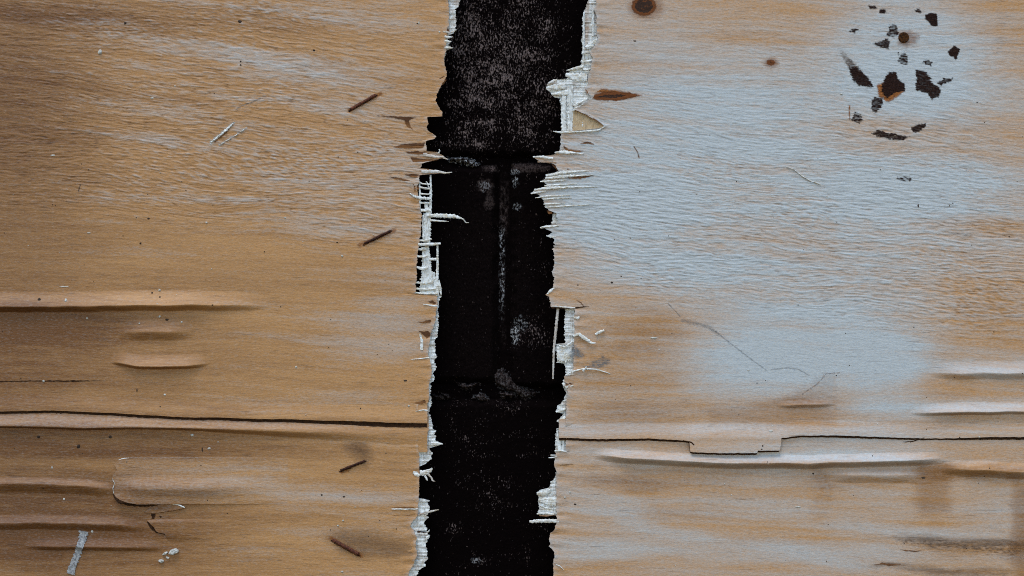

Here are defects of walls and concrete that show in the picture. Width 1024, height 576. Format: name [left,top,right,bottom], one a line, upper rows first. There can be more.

spalling [563,110,603,152]
peeling [392,142,481,191]
peeling [415,367,541,404]
crack [0,380,427,452]
crack [559,419,1024,466]